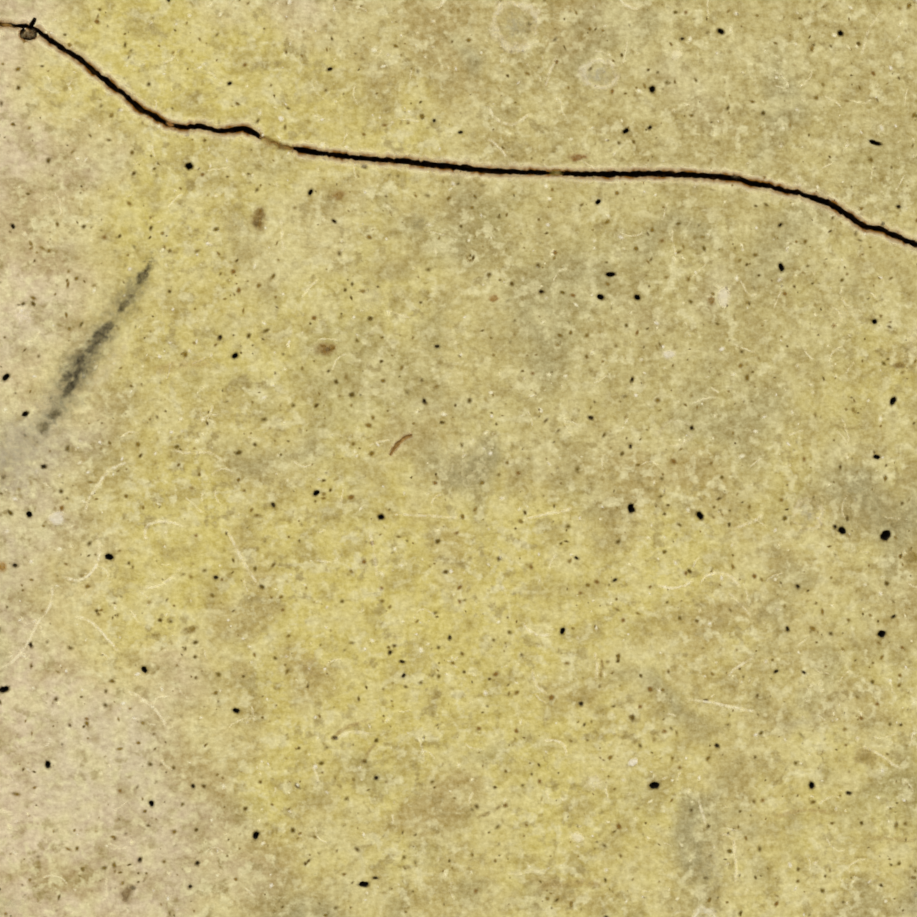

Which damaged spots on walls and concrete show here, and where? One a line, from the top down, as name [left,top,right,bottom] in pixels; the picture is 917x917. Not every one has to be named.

crack [0,18,917,248]